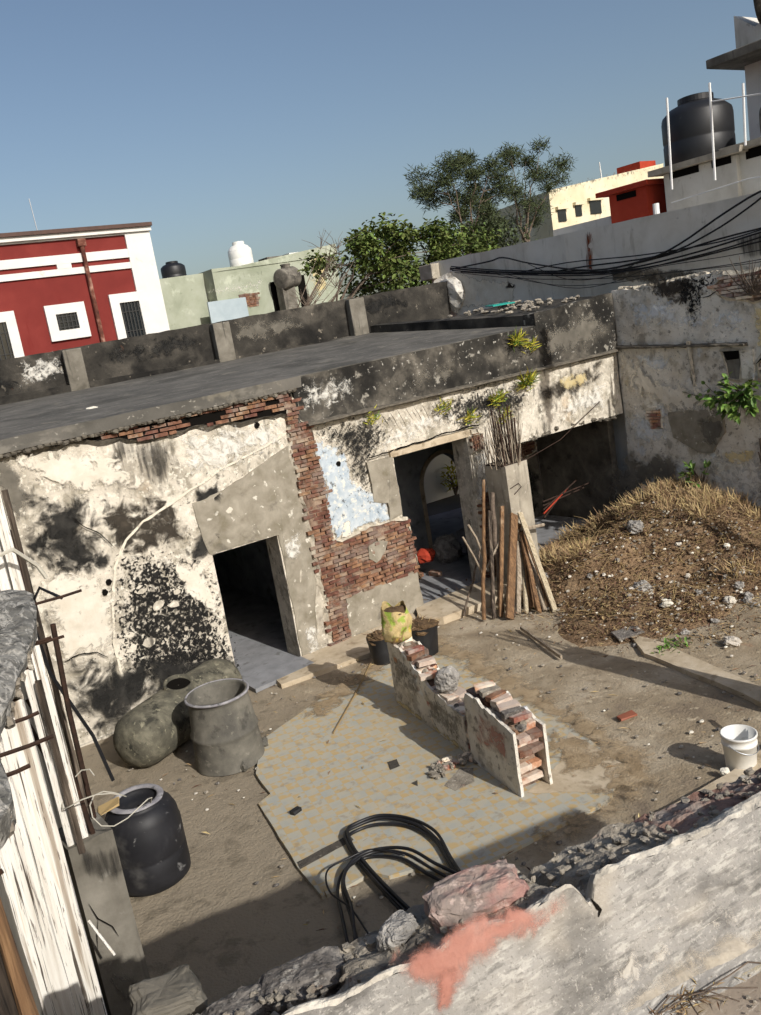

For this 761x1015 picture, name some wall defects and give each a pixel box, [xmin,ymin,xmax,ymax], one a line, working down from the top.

water stain [612,266,721,327]
spalling [667,267,761,304]
spalling [723,351,739,360]
water stain [439,379,529,428]
water stain [540,361,604,420]
spalling [0,388,420,646]
water stain [0,442,220,735]